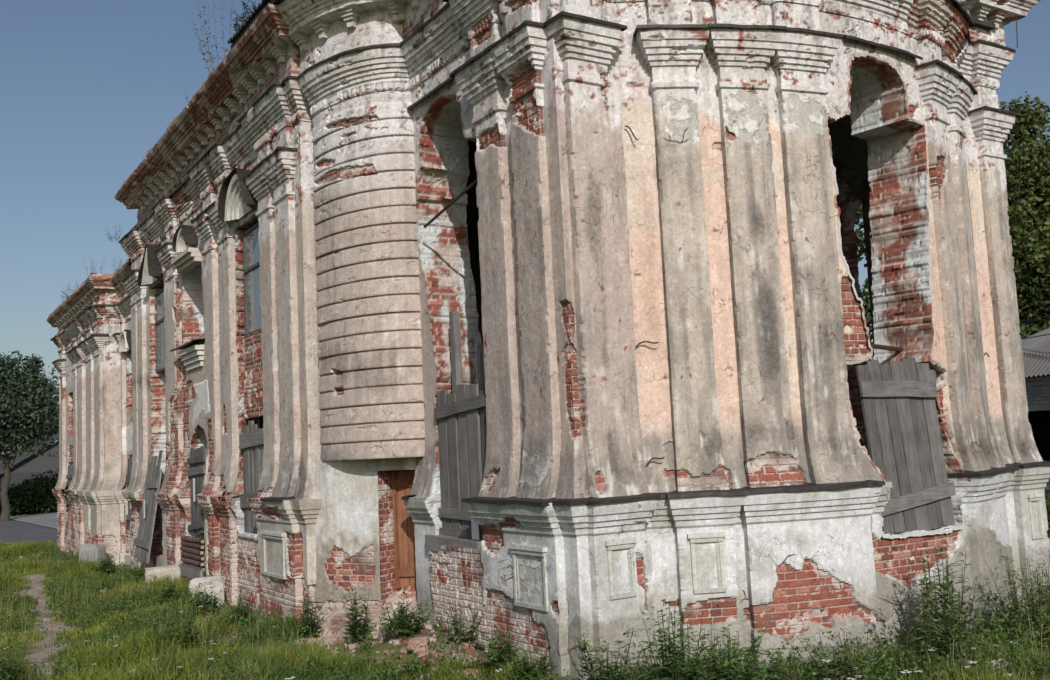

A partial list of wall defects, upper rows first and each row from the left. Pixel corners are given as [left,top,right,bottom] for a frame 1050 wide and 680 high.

flaking render [509,0,529,11]
flaking render [327,116,379,138]
flaking render [509,59,544,136]
flaking render [317,159,378,185]
flaking render [561,301,586,437]
flaking render [52,283,382,623]
flaking render [743,453,804,486]
flaking render [480,517,553,678]
flaking render [663,558,880,641]